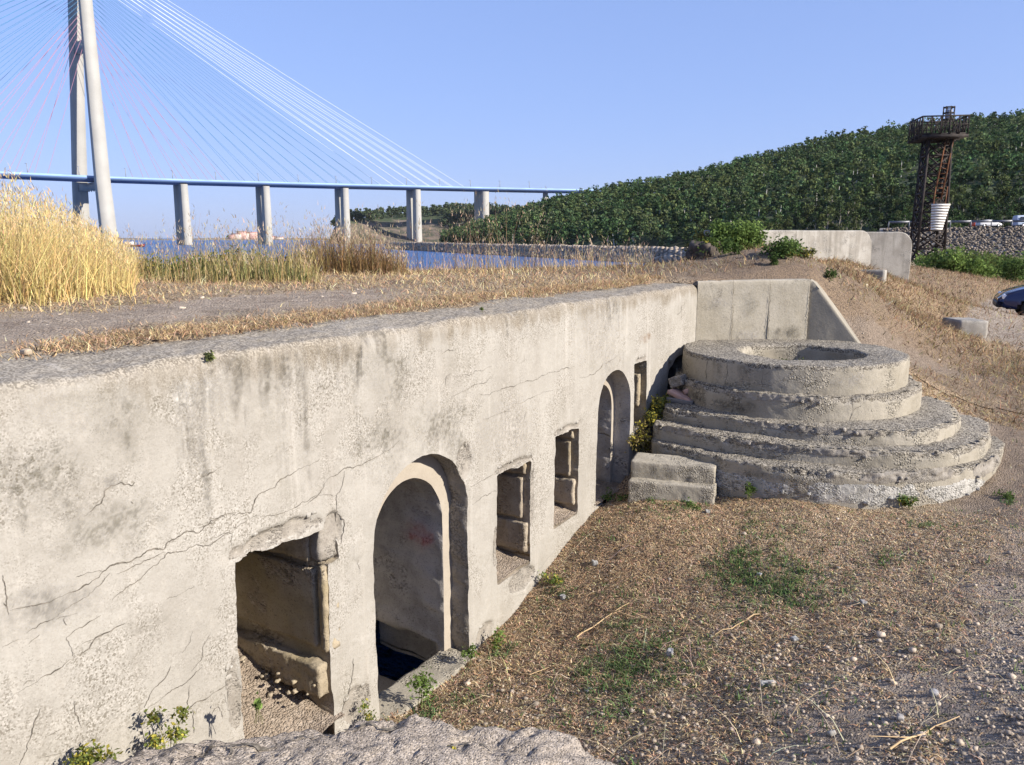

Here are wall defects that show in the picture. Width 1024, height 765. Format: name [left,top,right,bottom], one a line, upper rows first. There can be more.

crack [445,359,613,420]
spalling [229,509,342,560]
crack [3,440,400,705]